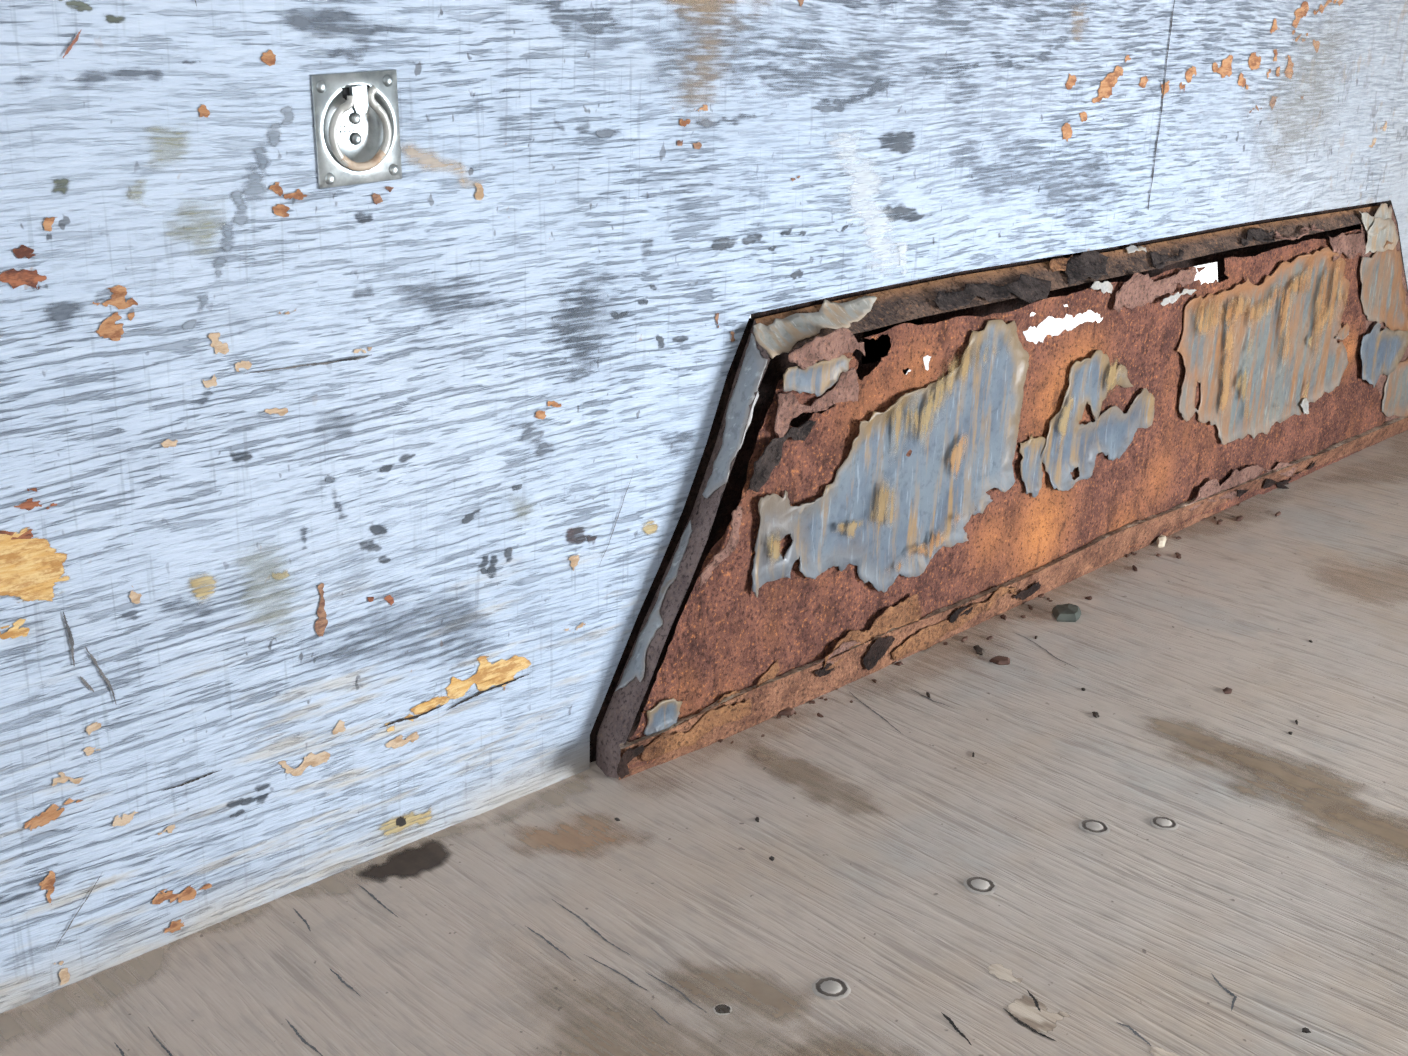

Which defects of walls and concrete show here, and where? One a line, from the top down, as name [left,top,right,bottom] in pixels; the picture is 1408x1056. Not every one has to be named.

peeling [1139,0,1343,98]
peeling [1061,55,1131,142]
peeling [92,285,138,341]
peeling [0,488,70,640]
peeling [278,751,330,776]
peeling [333,720,346,735]
peeling [385,655,531,749]
corrosion [778,707,795,716]
leakage [1150,719,1408,861]